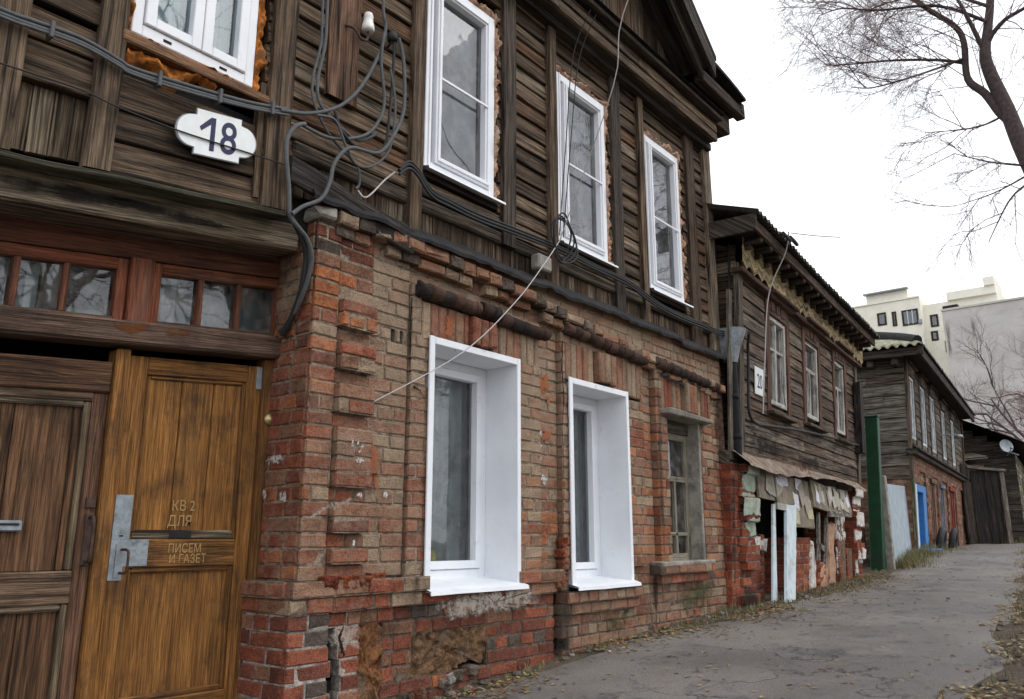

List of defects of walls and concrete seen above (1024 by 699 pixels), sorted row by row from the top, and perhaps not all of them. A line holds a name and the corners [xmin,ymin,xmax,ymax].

crack [325,626,345,693]
spalling [356,621,384,699]
spalling [397,619,488,699]